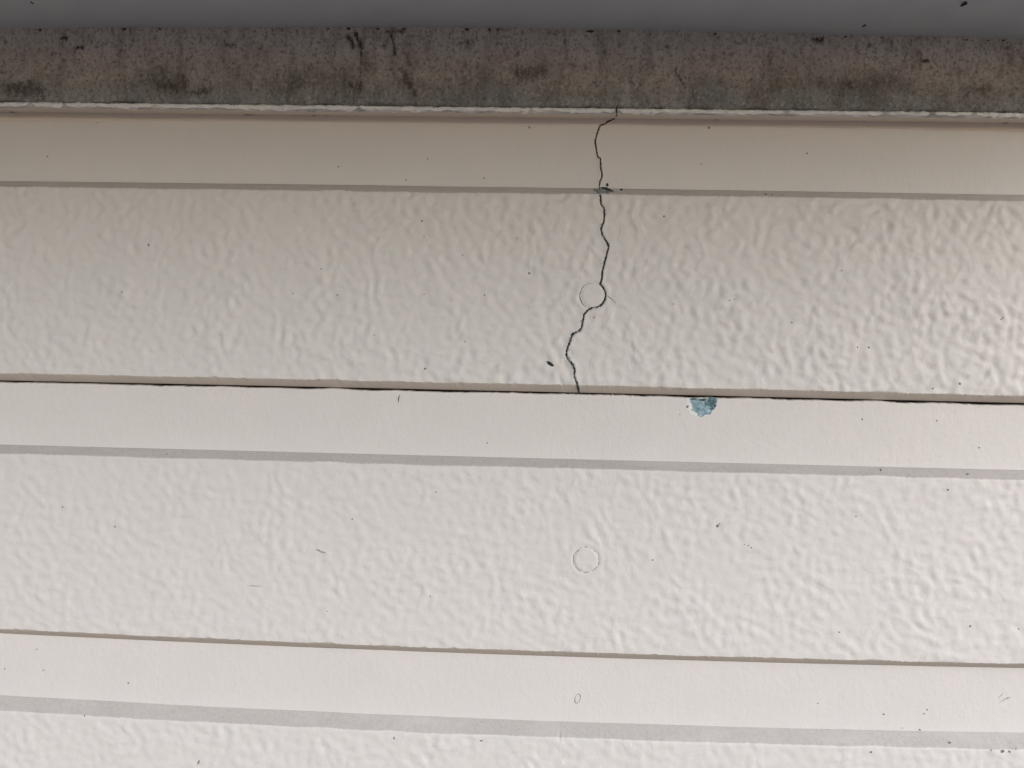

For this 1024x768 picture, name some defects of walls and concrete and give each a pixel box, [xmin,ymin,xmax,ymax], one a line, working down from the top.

crack [565,105,618,393]
peeling [686,397,718,417]